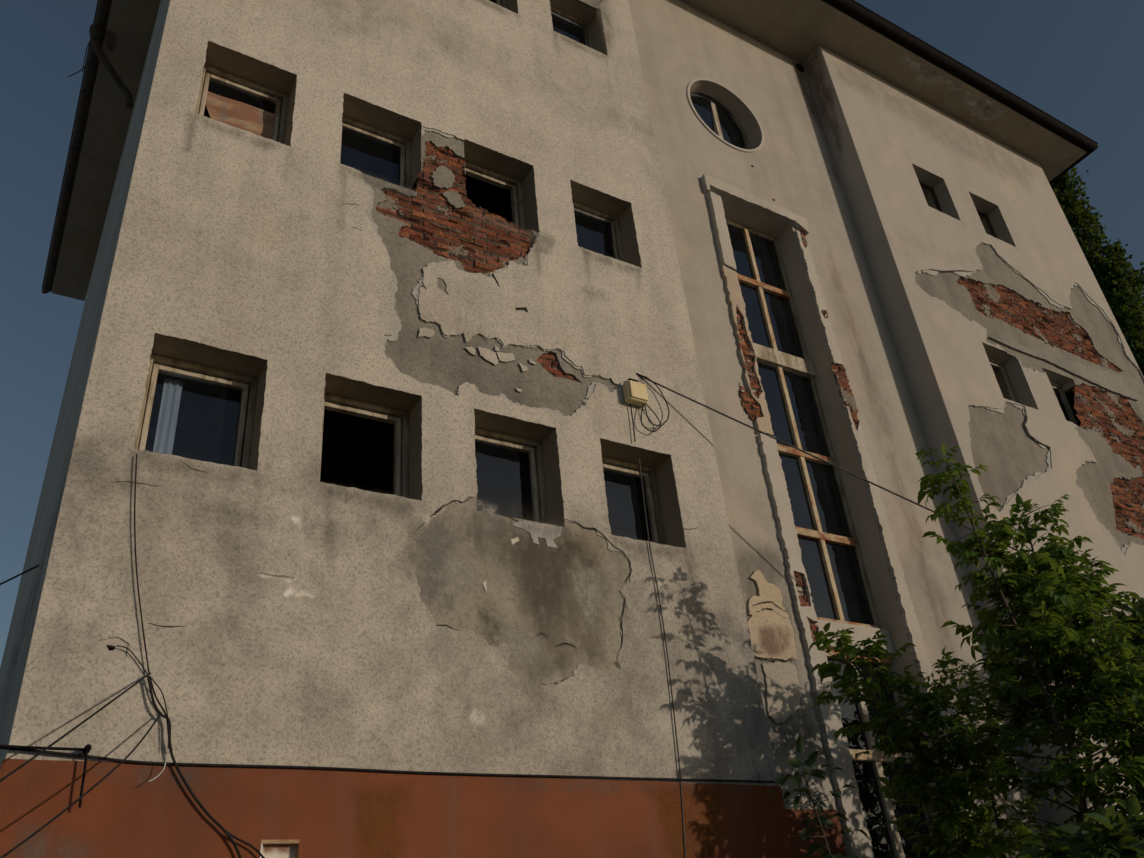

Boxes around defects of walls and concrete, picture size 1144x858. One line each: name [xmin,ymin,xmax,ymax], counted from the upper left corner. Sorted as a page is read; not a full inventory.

flaking render [575,0,602,11]
flaking render [360,127,620,416]
flaking render [736,309,762,421]
flaking render [831,363,859,428]
flaking render [914,243,1144,555]
flaking render [414,495,632,685]
flaking render [794,572,810,607]